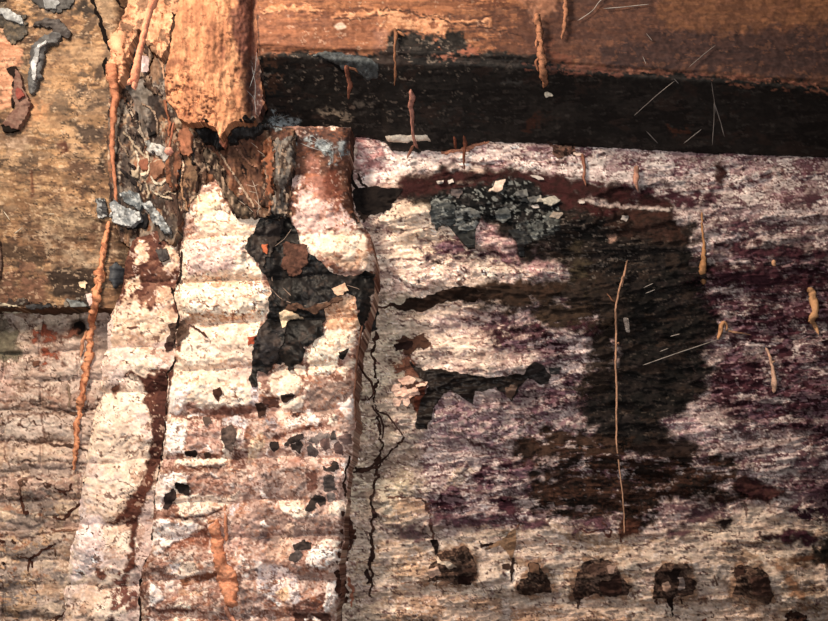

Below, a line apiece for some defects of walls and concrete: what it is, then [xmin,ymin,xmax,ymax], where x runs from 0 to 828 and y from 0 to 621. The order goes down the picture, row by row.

peeling [0,0,75,133]
crack [90,0,111,76]
peeling [247,283,349,365]
leakage [399,161,828,459]
crack [138,208,208,621]
spalling [389,333,431,416]
crack [334,326,436,607]
leakage [399,458,547,543]
leakage [667,497,733,538]
leakage [757,456,828,568]
spalling [423,523,558,600]
spalling [569,556,633,609]